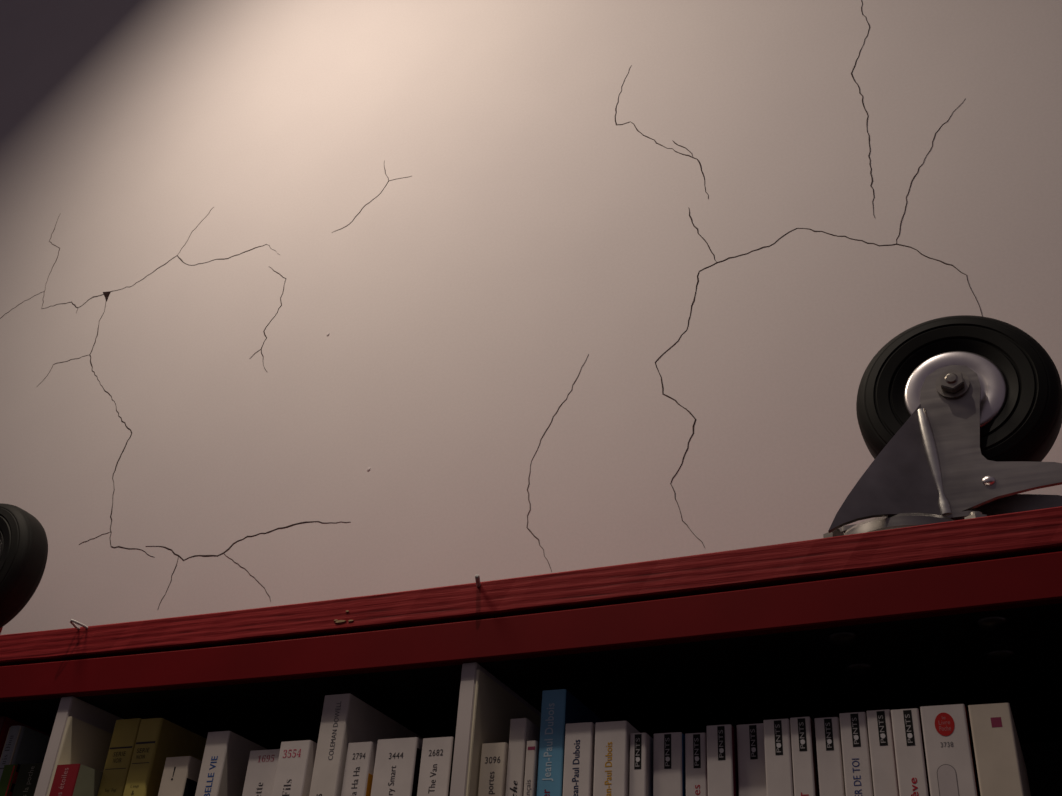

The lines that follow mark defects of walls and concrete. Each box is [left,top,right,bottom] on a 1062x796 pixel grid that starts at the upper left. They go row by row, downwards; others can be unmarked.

crack [0,210,347,608]
crack [336,167,410,231]
crack [526,354,589,572]
crack [615,65,982,547]
crack [851,0,875,218]